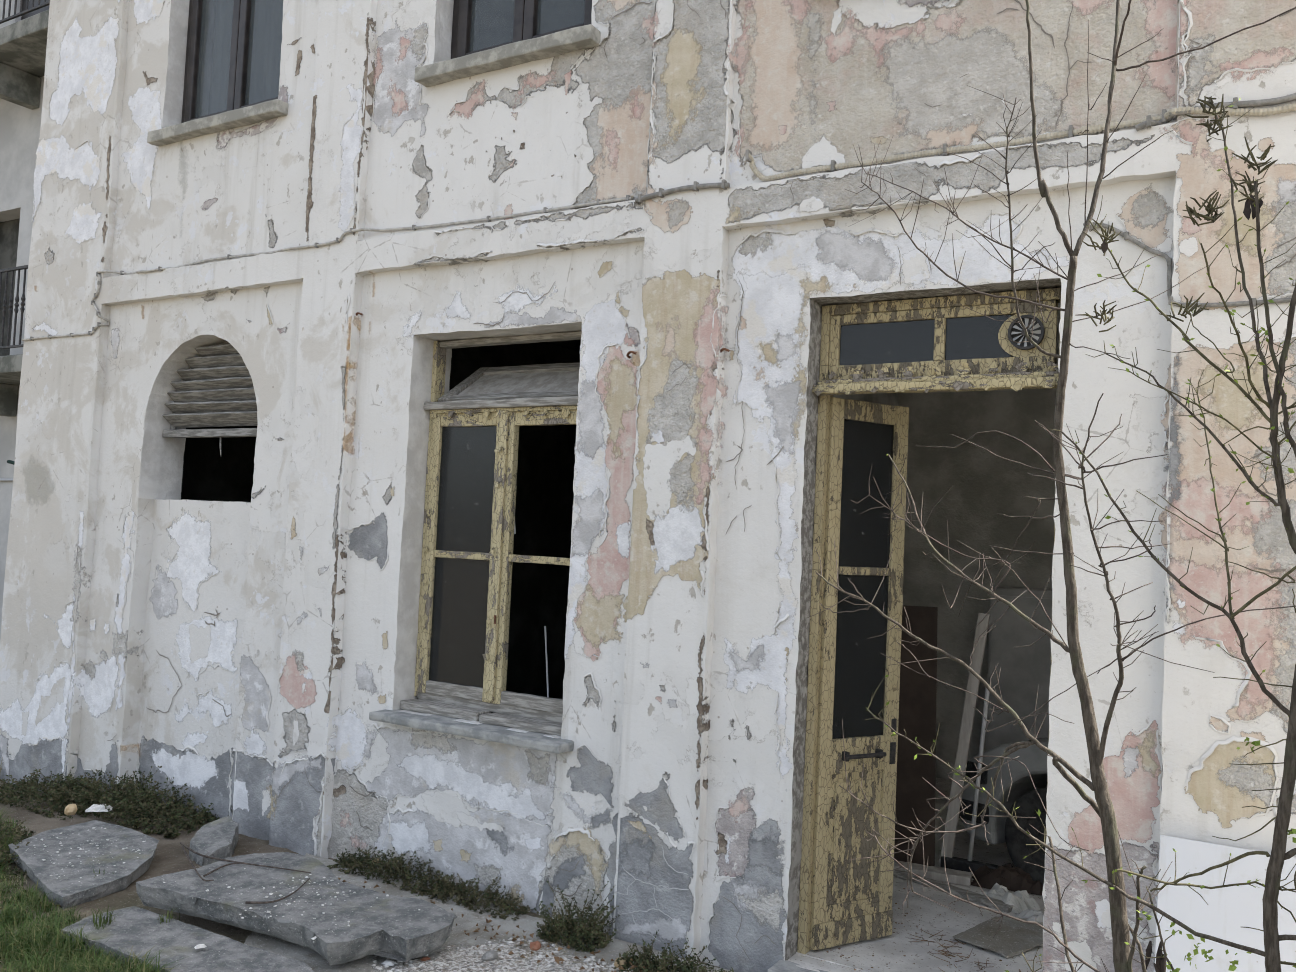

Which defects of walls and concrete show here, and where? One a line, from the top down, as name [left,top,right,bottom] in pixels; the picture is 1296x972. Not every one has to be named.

peeling [32,0,165,264]
spalling [338,17,432,235]
flaking render [446,0,1296,842]
peeling [150,439,395,758]
spalling [713,787,756,881]
spalling [1042,720,1163,972]